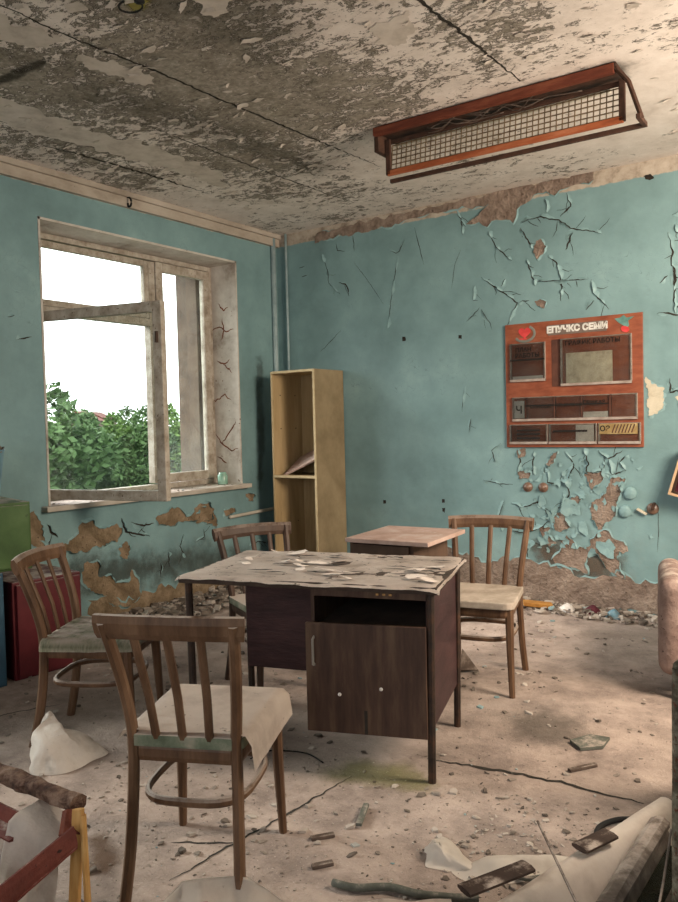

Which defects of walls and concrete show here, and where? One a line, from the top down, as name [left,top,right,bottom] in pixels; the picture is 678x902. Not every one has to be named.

peeling [0,13,65,49]
peeling [76,35,167,86]
peeling [179,0,232,18]
crack [417,0,520,81]
peeling [0,97,252,218]
crack [657,212,678,316]
peeling [645,377,678,419]
crack [667,378,678,393]
peeling [156,500,236,529]
peeling [447,447,658,615]
peeling [64,517,225,616]
crack [427,758,644,804]